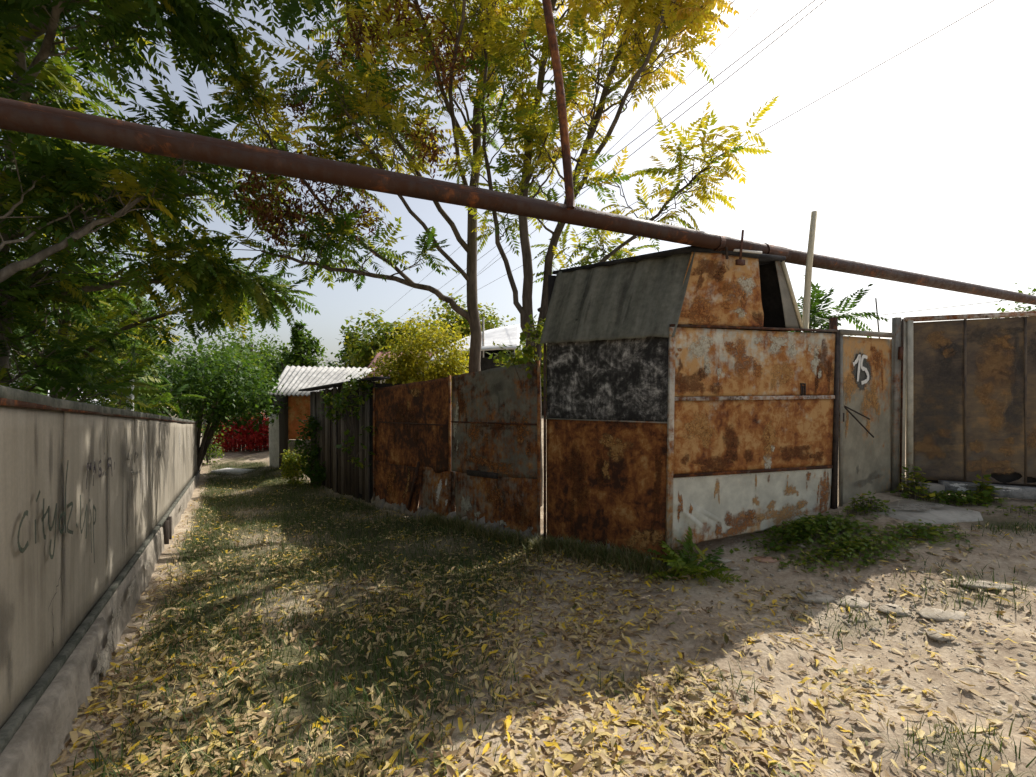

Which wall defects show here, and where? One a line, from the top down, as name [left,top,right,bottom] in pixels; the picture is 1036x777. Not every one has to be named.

corrosion [681,259,762,327]
corrosion [675,348,719,394]
corrosion [724,339,762,378]
corrosion [815,339,883,435]
corrosion [677,493,693,521]
corrosion [682,427,830,538]